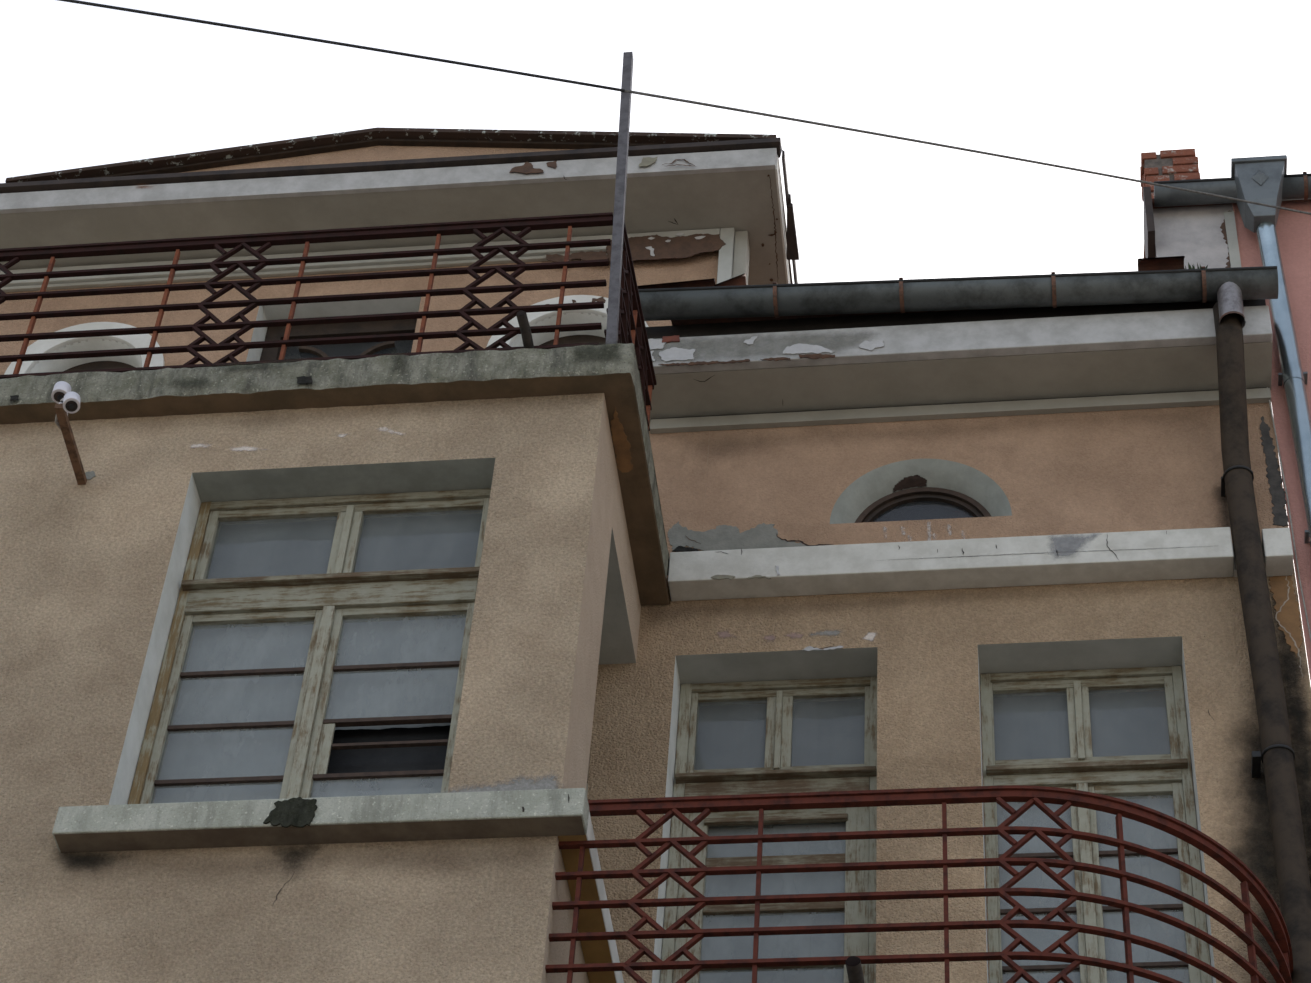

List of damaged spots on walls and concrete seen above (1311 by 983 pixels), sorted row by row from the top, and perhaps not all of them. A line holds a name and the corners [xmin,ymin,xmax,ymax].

peeling [509,161,565,179]
peeling [628,233,726,261]
peeling [668,521,831,554]
water stain [1276,624,1311,887]
water stain [1235,711,1281,983]